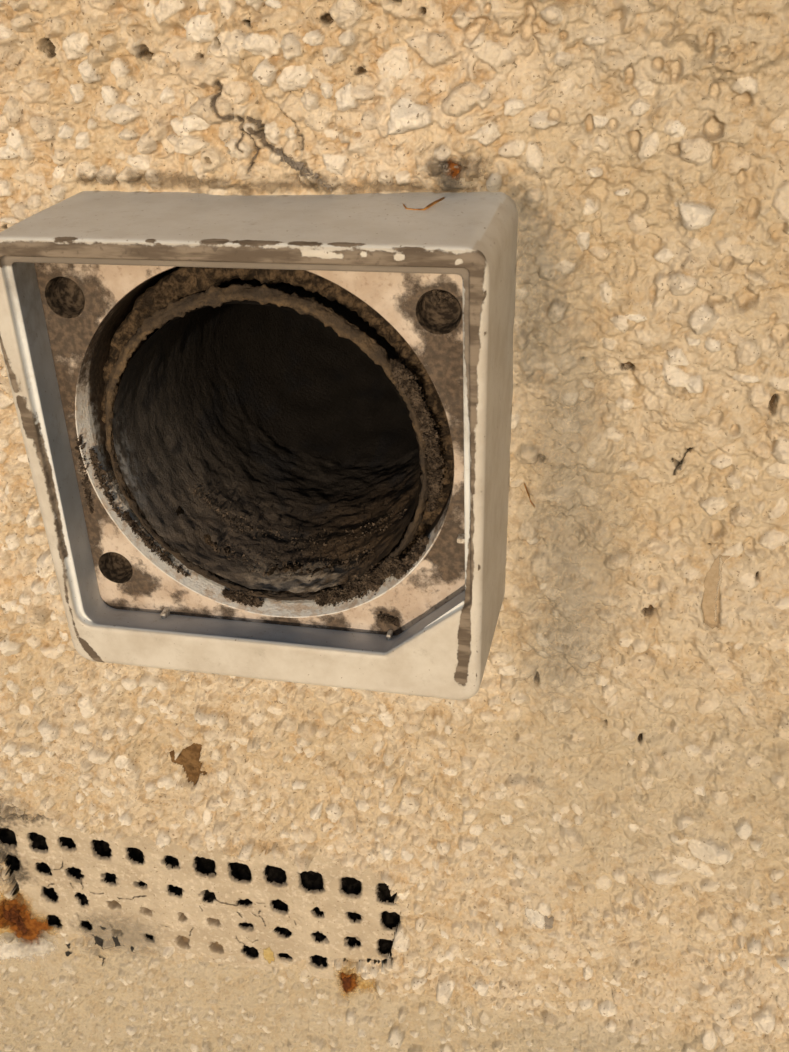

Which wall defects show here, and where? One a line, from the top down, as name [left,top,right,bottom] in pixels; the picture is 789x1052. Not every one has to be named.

spalling [169,743,207,785]
rust [0,893,54,942]
rust [338,967,374,997]